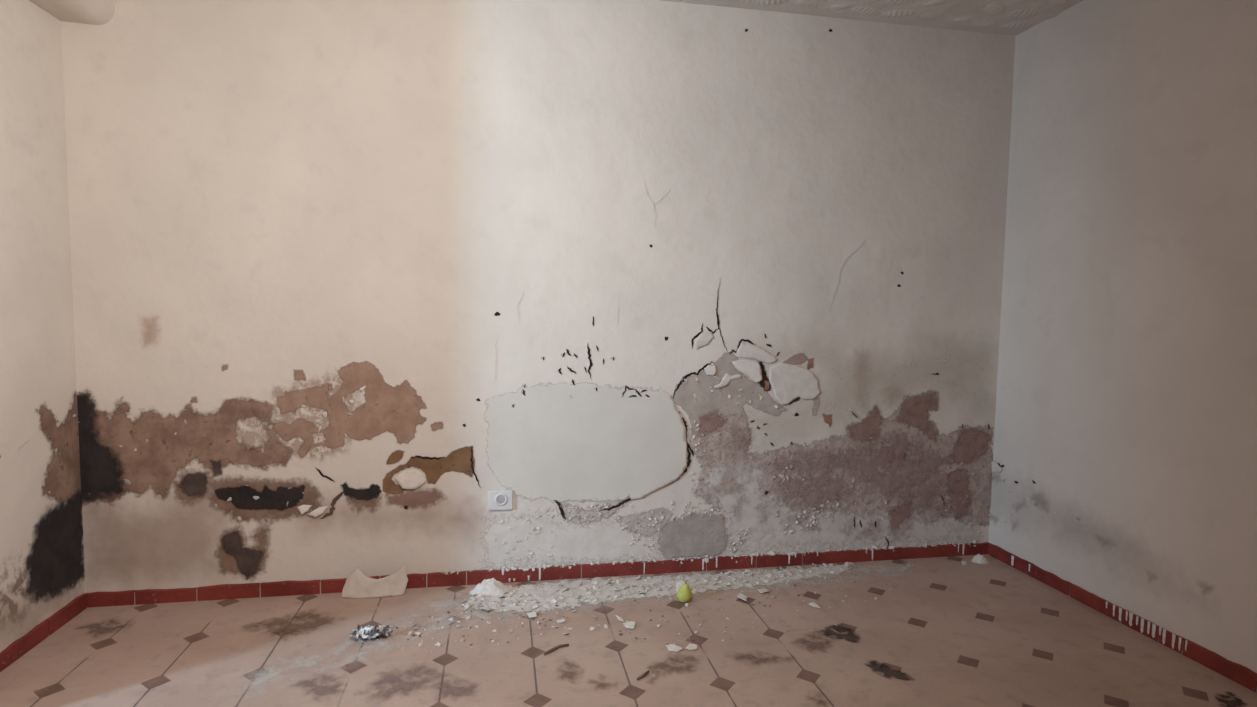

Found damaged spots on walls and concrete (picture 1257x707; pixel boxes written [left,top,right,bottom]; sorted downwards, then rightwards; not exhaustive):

crack [691,285,780,356]
peeling [36,392,81,503]
peeling [210,361,481,521]
peeling [673,343,821,446]
leakage [0,393,292,615]